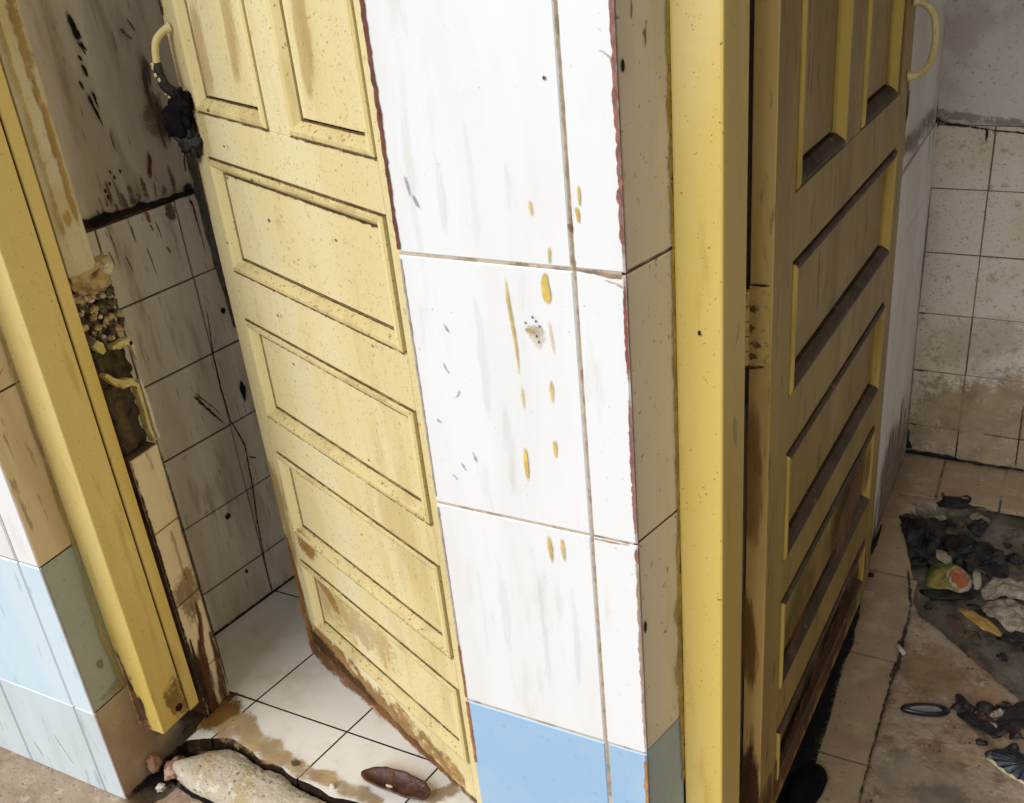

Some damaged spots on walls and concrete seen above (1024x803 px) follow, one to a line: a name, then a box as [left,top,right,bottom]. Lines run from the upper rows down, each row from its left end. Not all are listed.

damp [66,11,116,150]
damp [142,56,171,148]
damp [904,105,1024,157]
damp [916,205,930,331]
spalling [67,254,160,455]
damp [831,345,1024,560]
corrosion [133,453,228,718]